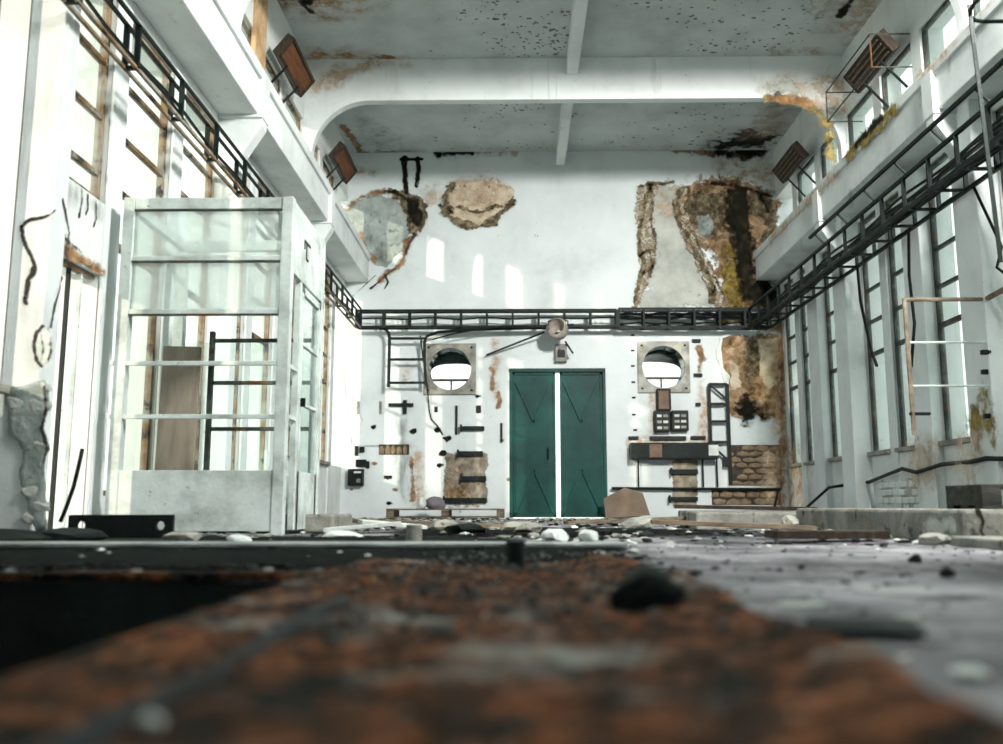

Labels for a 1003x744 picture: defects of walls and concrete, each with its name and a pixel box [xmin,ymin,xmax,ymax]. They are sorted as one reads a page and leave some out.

rust [310,52,394,89]
flaking render [344,179,516,267]
flaking render [631,180,729,307]
damp [672,76,844,319]
flaking render [716,333,783,427]
flaking render [0,380,109,541]